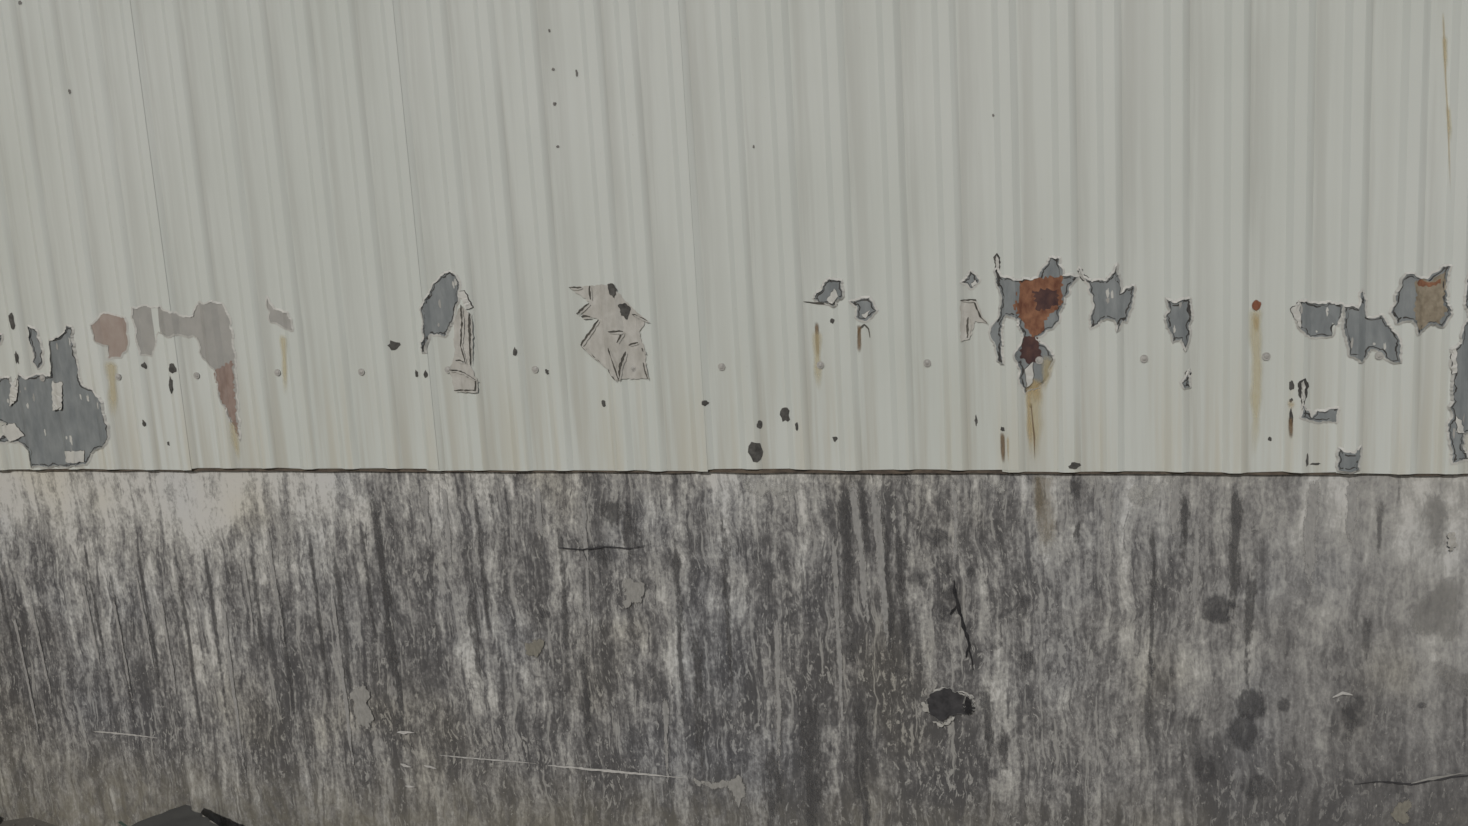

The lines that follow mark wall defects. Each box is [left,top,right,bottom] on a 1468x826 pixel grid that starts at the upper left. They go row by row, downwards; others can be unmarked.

peeling [0,300,242,469]
peeling [415,270,474,378]
peeling [959,253,1137,408]
peeling [1163,296,1194,391]
peeling [1289,263,1468,465]
water stain [136,556,202,736]
water stain [362,499,404,742]
water stain [662,540,704,783]
water stain [832,483,910,826]
spalling [921,687,976,727]
crack [950,580,973,670]
water stain [1169,477,1262,749]